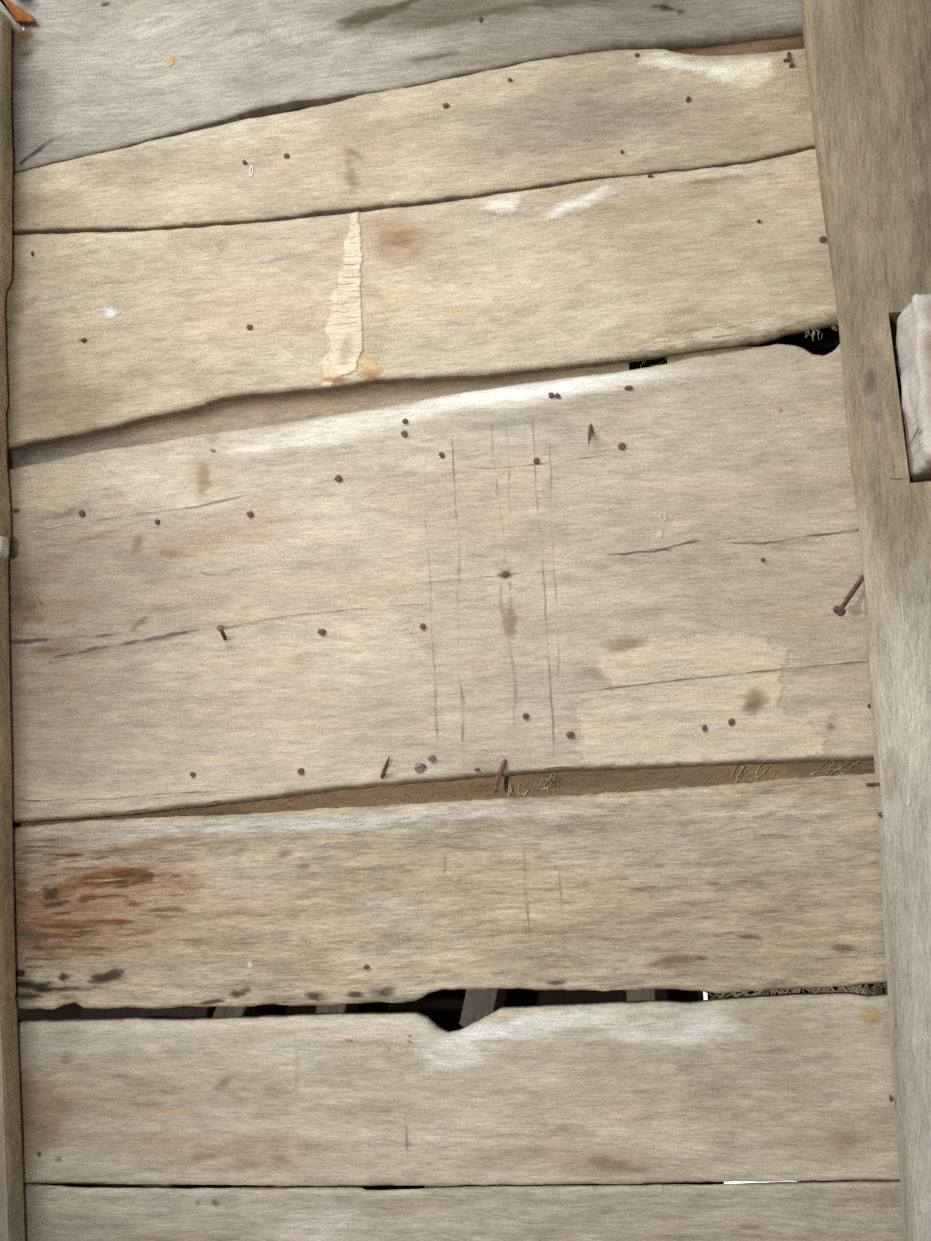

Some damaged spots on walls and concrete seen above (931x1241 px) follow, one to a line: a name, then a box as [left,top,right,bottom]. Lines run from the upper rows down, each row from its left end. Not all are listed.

peeling [324,343,381,381]
crack [609,540,696,555]
crack [729,529,859,544]
crack [12,630,197,663]
crack [583,661,868,692]
rust [18,846,178,968]